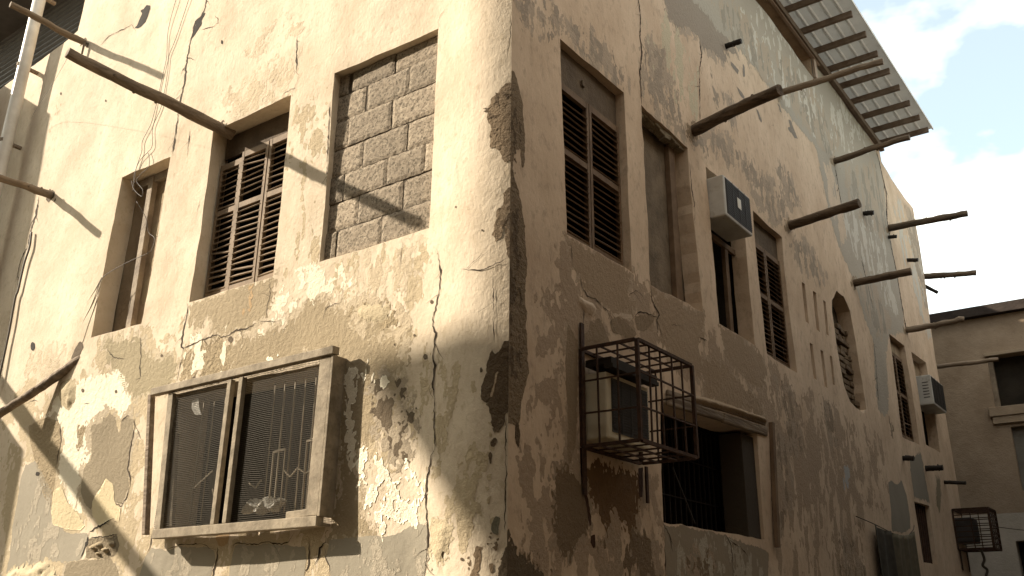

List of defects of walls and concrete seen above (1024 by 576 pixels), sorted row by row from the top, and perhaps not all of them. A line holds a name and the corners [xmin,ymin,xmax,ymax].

crack [168,0,218,153]
crack [636,0,644,104]
peeling [664,0,745,99]
peeling [823,156,846,237]
crack [177,286,276,378]
spalling [480,71,529,464]
crack [550,243,707,341]
peeling [179,262,428,544]
crack [417,252,442,576]
peeling [28,369,134,576]
crack [147,534,330,576]